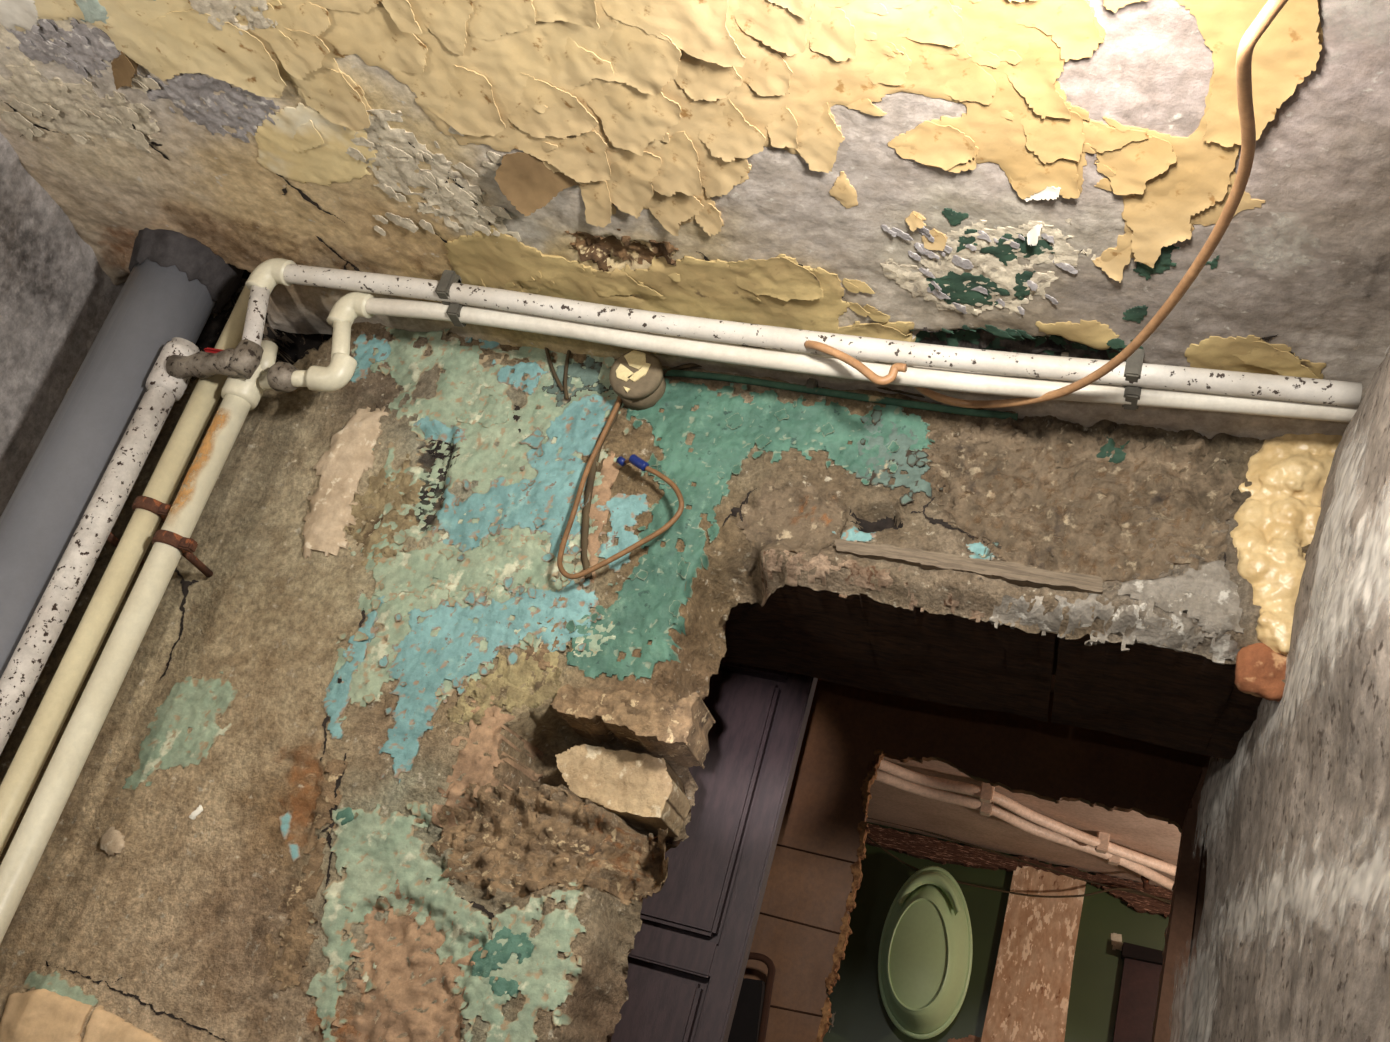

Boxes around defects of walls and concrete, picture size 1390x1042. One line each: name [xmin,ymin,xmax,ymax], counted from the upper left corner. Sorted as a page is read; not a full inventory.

peeling [0,0,1323,365]
peeling [1184,335,1326,379]
rust [170,411,227,512]
peeling [122,665,239,791]
flaking render [263,327,1243,1042]
crack [46,961,227,1042]